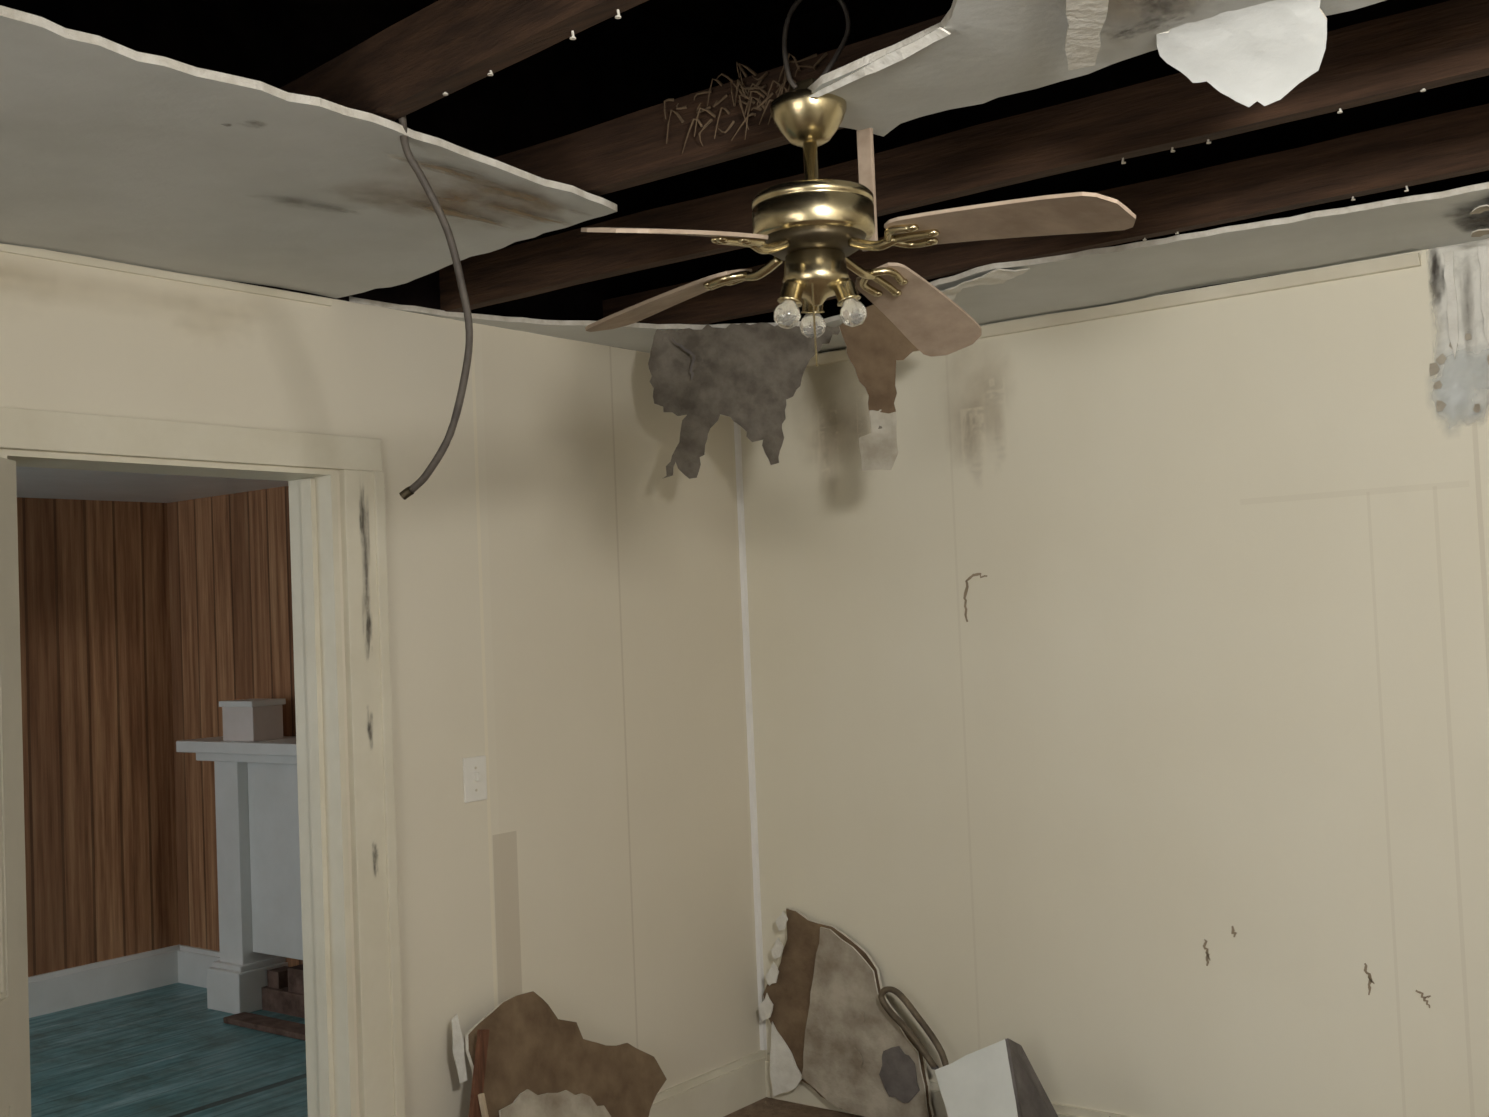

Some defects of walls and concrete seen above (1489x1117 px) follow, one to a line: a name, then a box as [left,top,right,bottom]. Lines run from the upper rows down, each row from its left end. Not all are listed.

peeling [1429,198,1489,424]
crack [963,573,987,622]